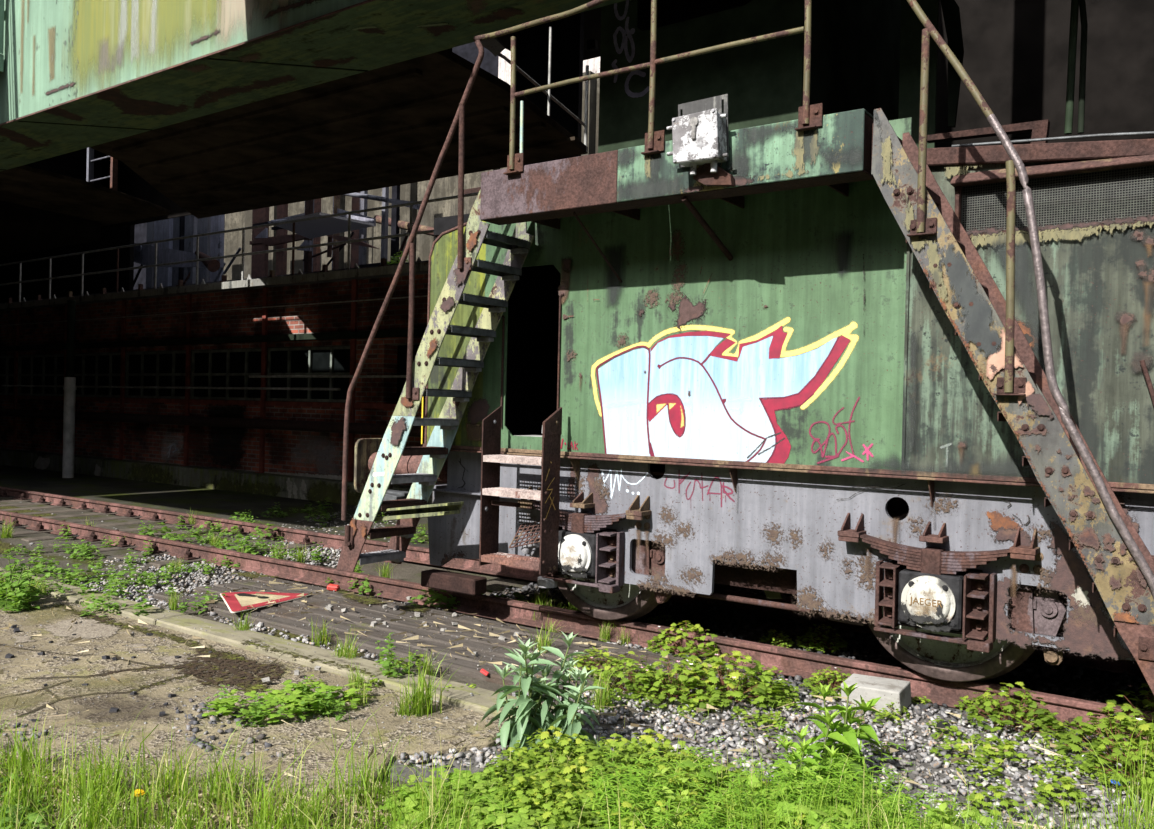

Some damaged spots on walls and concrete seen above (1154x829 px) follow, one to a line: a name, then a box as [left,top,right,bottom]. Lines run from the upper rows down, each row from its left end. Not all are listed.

rust [0,0,375,126]